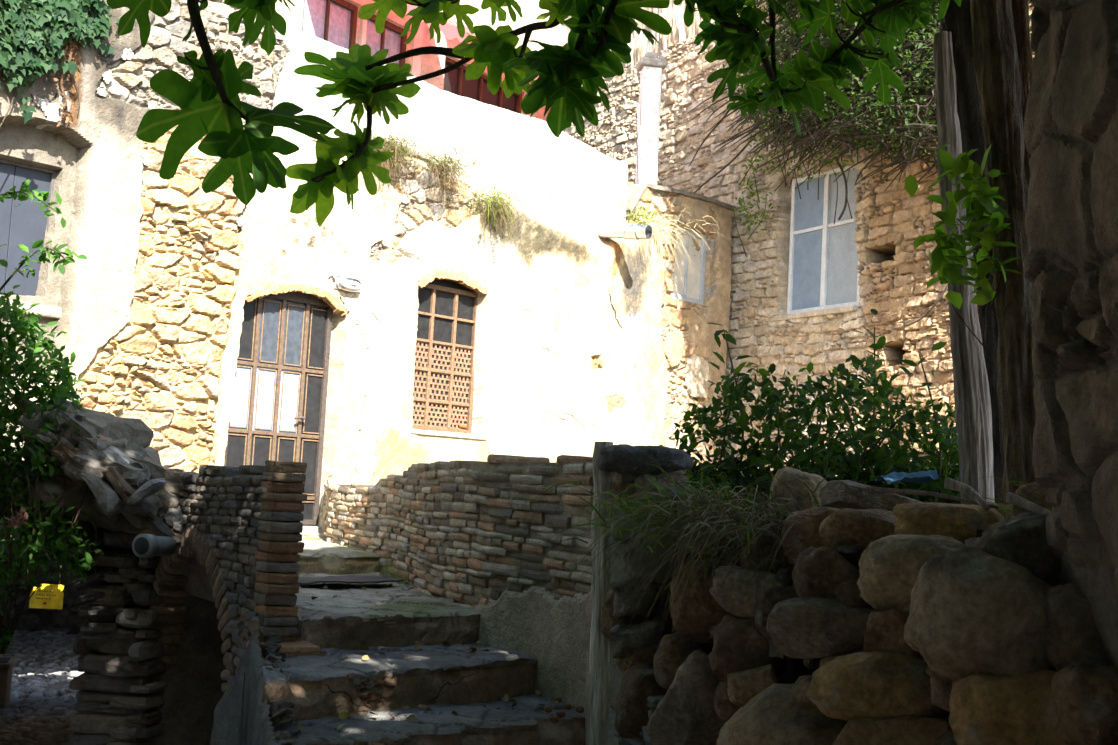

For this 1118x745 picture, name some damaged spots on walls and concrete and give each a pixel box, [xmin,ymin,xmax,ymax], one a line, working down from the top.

spalling [369,147,481,262]
water stain [624,251,647,320]
flaking render [634,327,712,446]